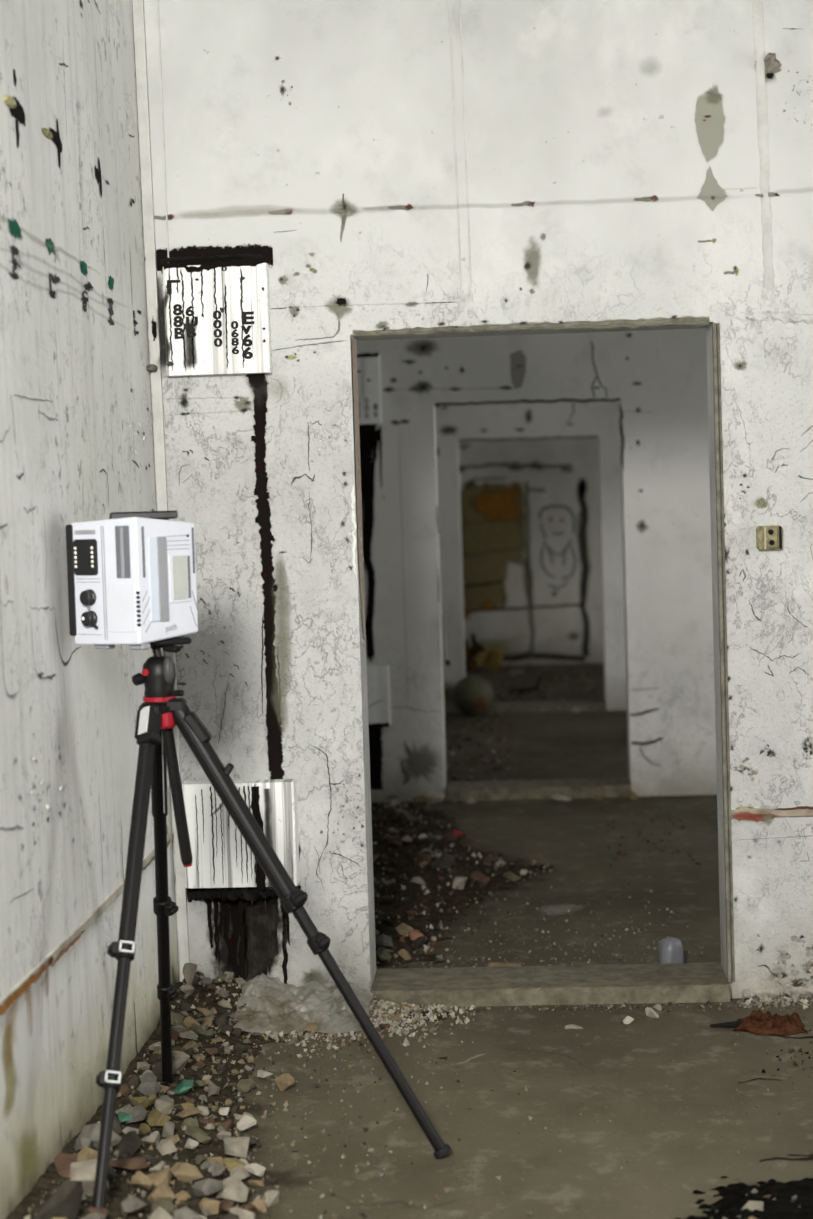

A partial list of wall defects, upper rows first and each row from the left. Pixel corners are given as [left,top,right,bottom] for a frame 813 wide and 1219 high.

damp [285,298,710,393]
damp [435,350,640,470]
damp [234,374,288,846]
damp [359,419,409,662]
damp [460,478,590,664]
damp [369,722,389,790]
corrosion [734,806,813,824]
damp [175,787,290,984]
corrosion [0,931,84,1016]